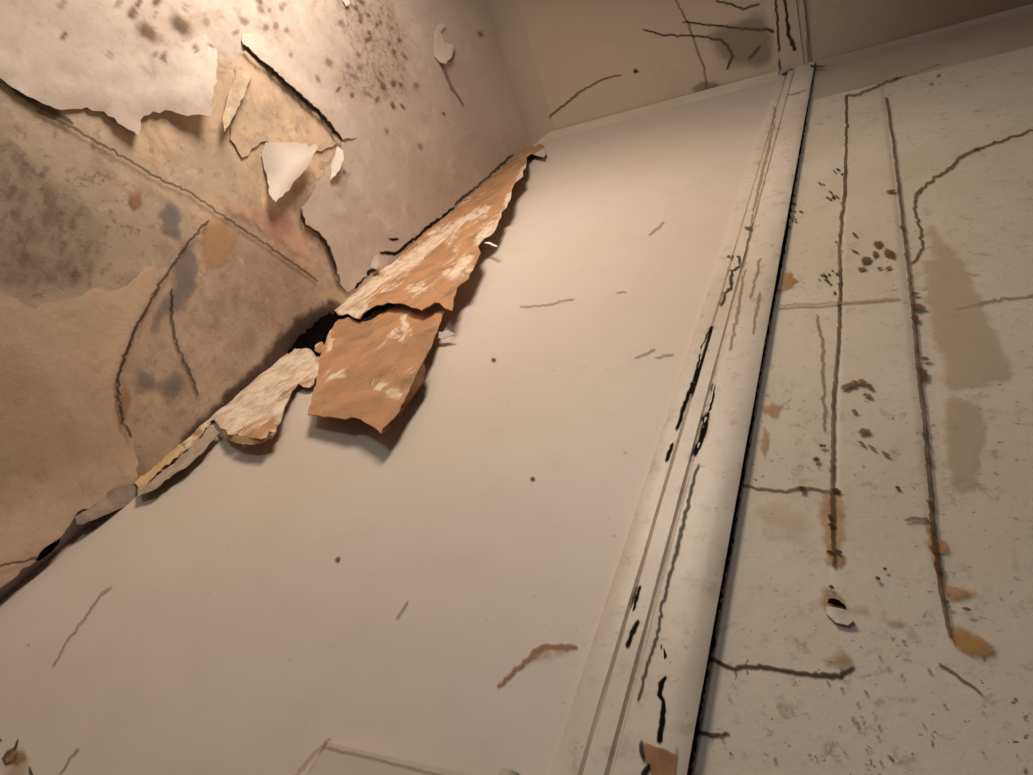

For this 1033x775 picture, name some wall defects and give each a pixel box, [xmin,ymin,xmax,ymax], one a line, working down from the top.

mould [130,0,157,37]
mould [174,15,190,32]
damp [337,0,405,108]
crack [549,75,621,118]
damp [160,201,181,233]
damp [153,249,197,327]
peeling [0,14,395,589]
crack [5,82,513,437]
crack [644,0,1033,775]
crack [626,255,741,743]
crack [0,739,33,775]
spalling [639,741,677,775]